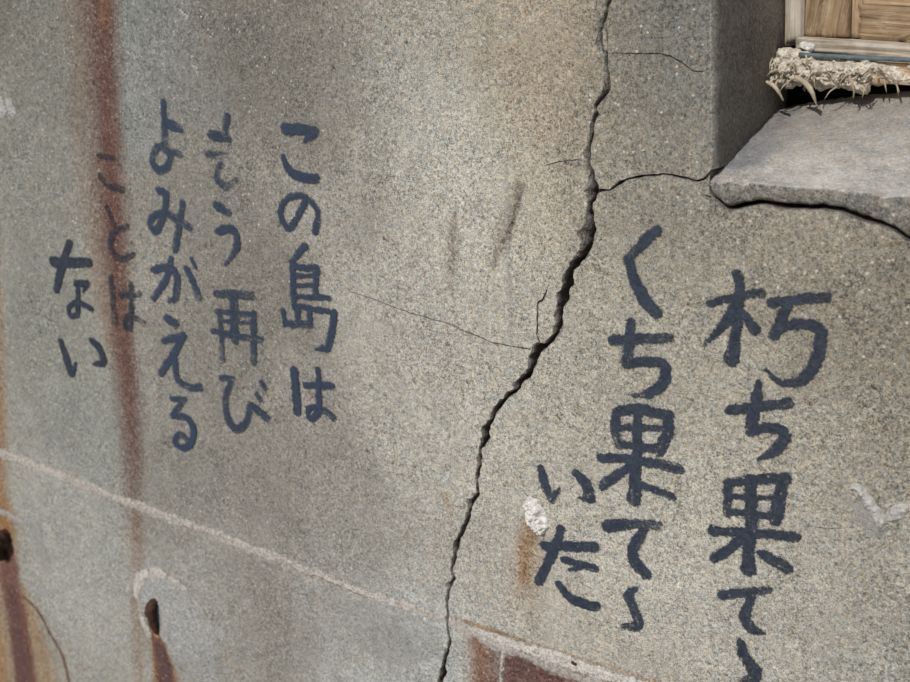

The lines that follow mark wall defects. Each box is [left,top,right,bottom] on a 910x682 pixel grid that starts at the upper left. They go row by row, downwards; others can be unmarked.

corrosion [89,0,139,471]
crack [349,0,910,682]
corrosion [0,378,70,682]
corrosion [151,631,174,682]
corrosion [469,624,586,682]